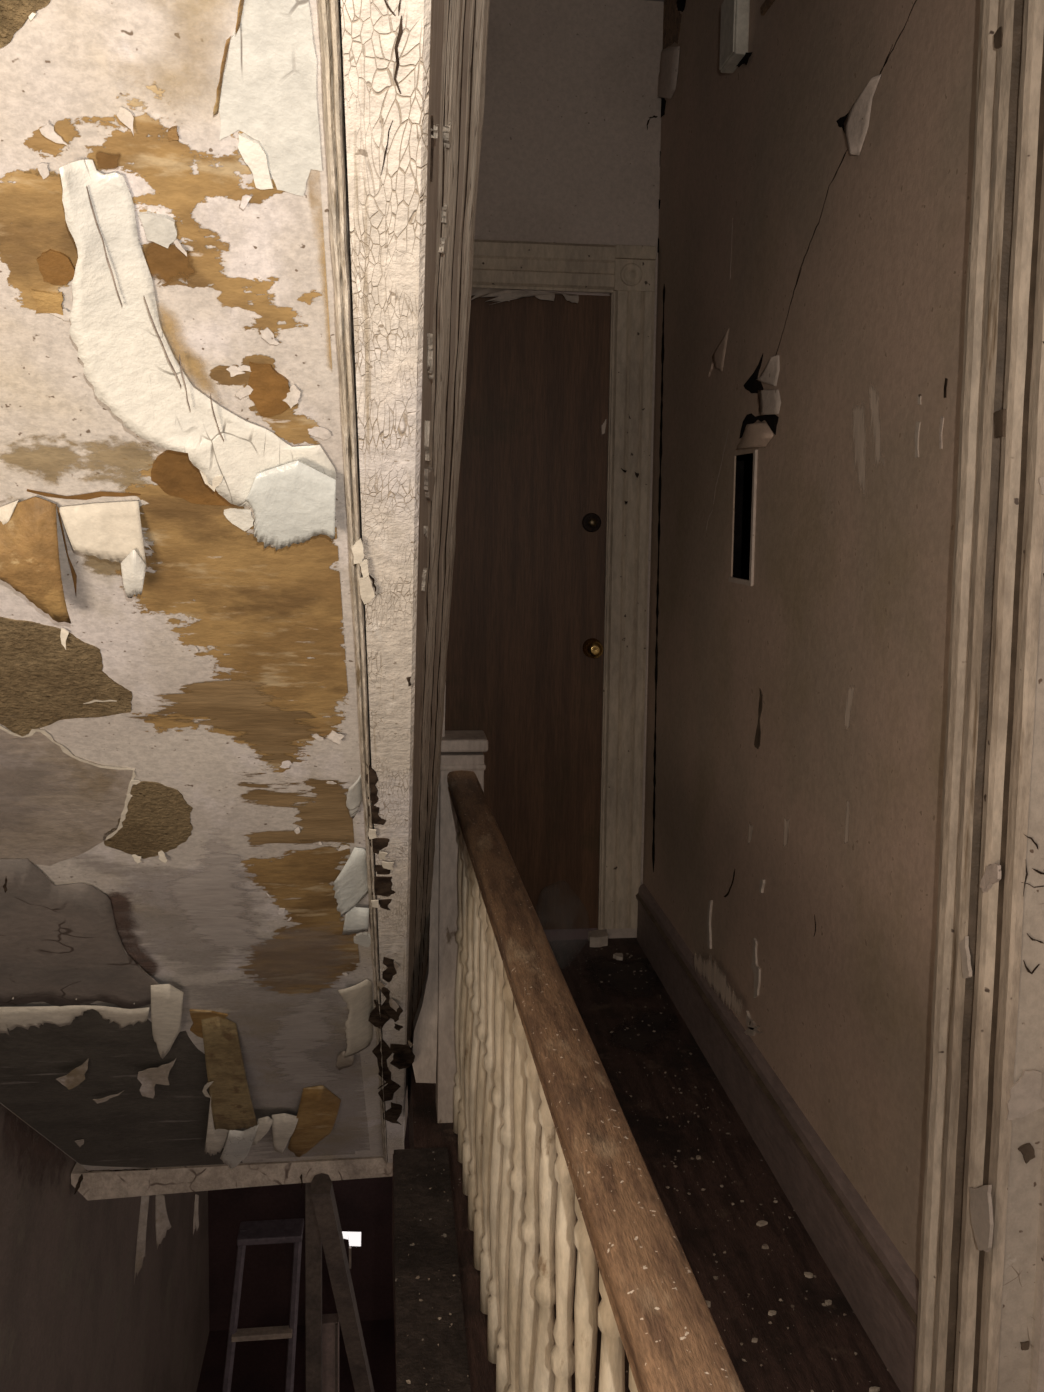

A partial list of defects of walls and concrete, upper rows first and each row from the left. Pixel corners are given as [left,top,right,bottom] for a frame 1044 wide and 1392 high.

crack [381,0,403,174]
crack [427,115,435,182]
peeling [431,122,452,149]
peeling [438,205,448,254]
crack [775,149,848,356]
crack [879,0,917,75]
peeling [0,0,376,773]
flaking render [103,780,193,864]
peeling [238,763,415,1125]
flaking render [0,1004,243,1168]